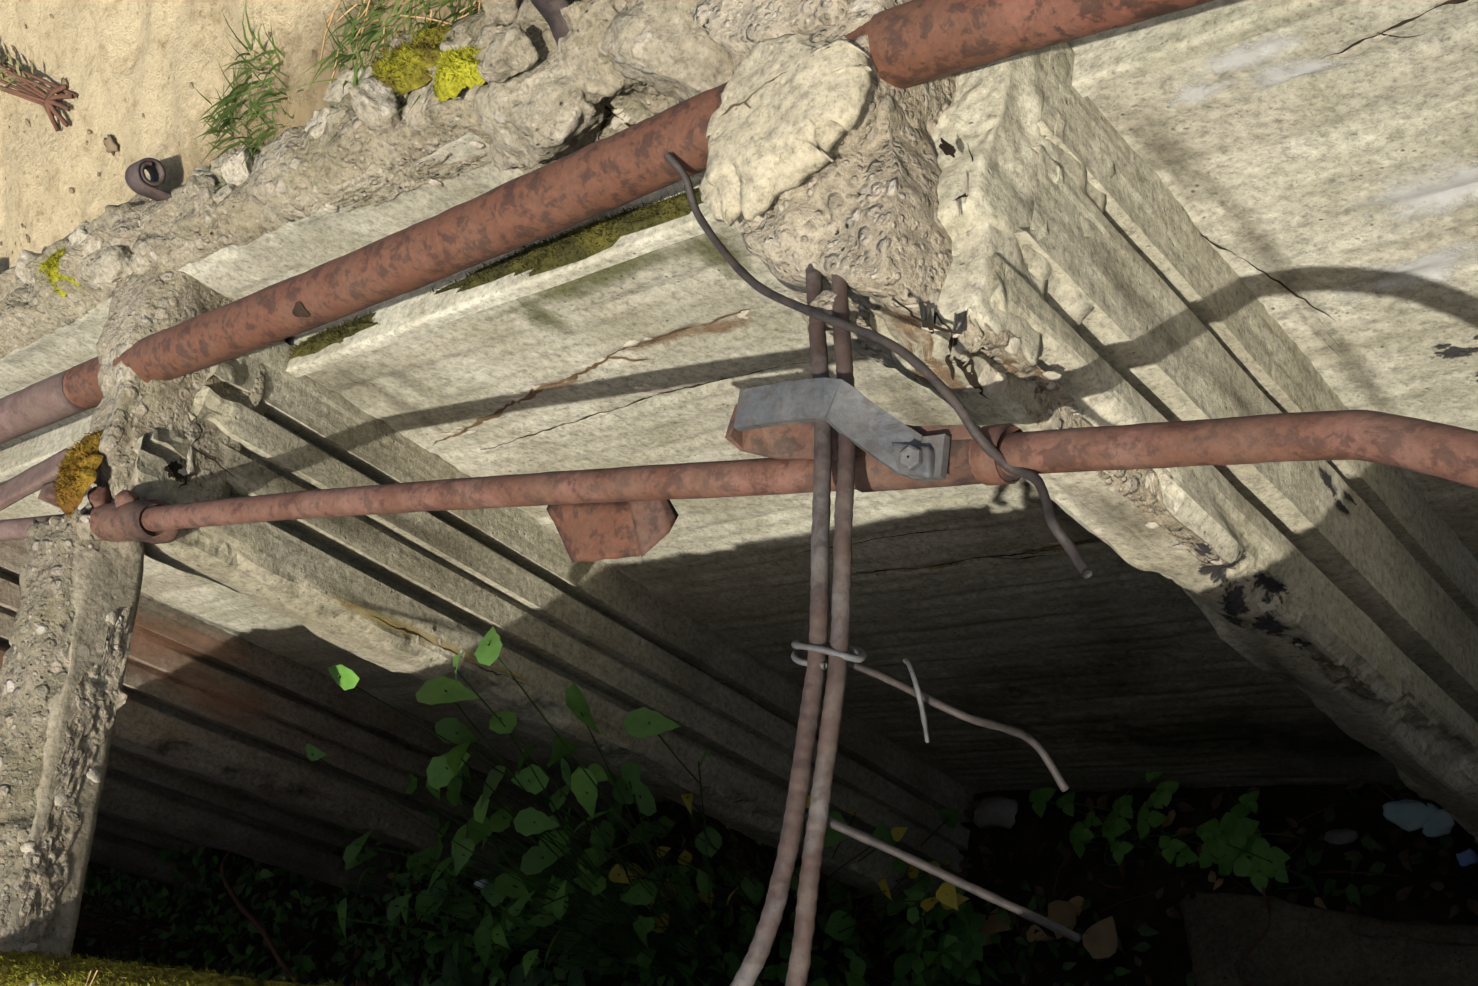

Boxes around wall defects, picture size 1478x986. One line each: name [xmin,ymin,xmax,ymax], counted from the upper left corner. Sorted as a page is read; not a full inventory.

crack [1323,0,1468,59]
spalling [317,141,492,214]
crack [432,305,811,450]
corrosion [636,318,743,347]
corrosion [889,315,960,389]
corrosion [141,529,180,544]
water stain [1189,542,1311,650]